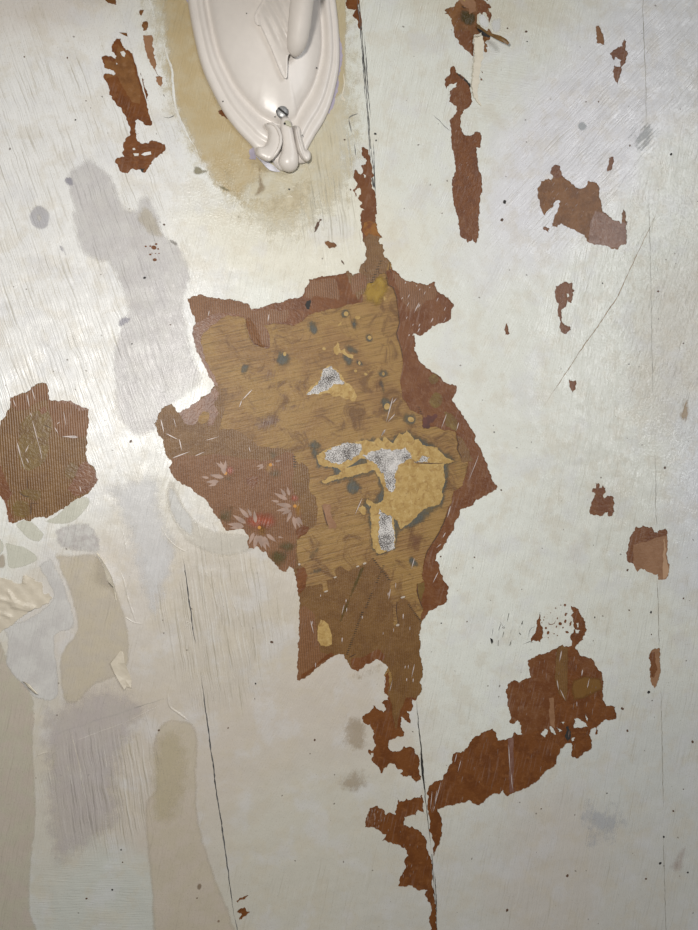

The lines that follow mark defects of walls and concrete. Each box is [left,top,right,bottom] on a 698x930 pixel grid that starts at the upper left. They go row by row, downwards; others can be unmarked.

peeling [102,33,166,173]
leakage [154,0,361,232]
crack [357,1,376,194]
peeling [445,0,509,243]
peeling [596,26,628,84]
leakage [70,162,199,433]
peeling [0,383,98,633]
crack [184,565,196,642]
peeling [146,147,627,930]
peeling [626,526,669,580]
crack [202,686,238,930]
crack [417,714,430,836]